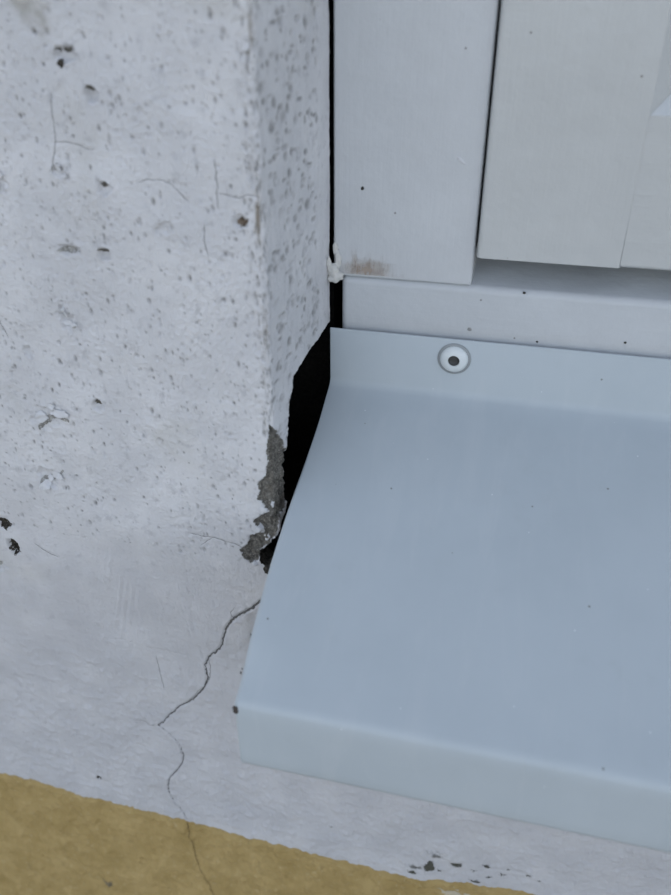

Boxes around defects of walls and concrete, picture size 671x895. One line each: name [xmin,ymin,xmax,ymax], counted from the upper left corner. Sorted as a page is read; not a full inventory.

spalling [0,517,21,555]
spalling [240,425,288,565]
crack [133,600,260,895]